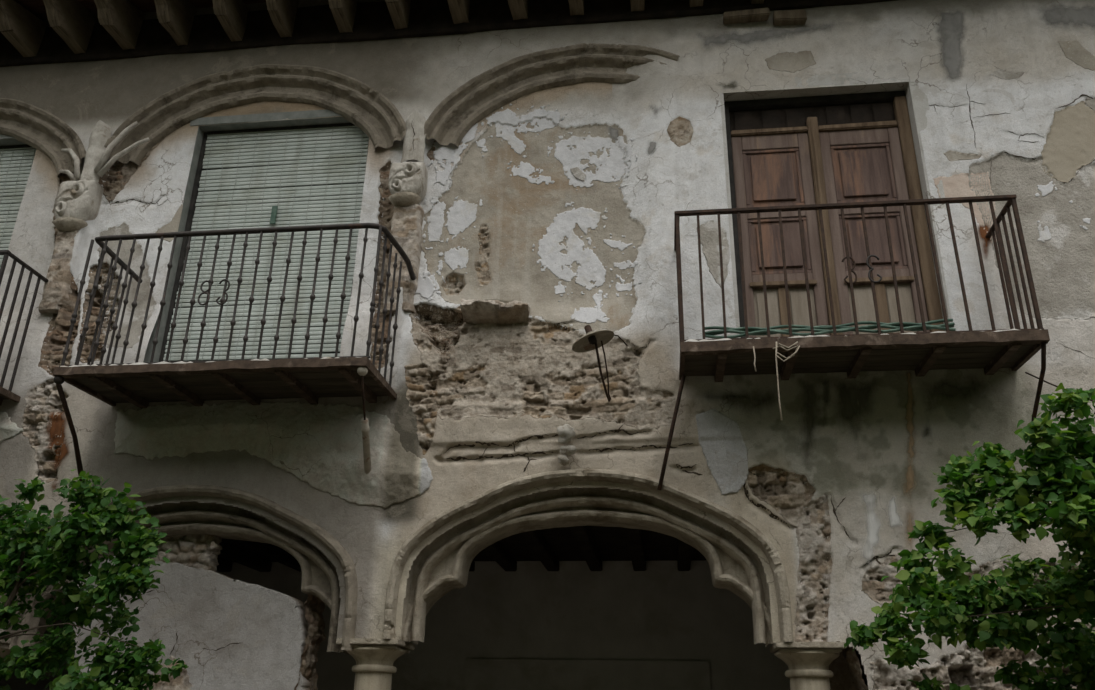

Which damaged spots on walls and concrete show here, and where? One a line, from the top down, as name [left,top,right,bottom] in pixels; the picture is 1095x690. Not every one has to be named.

peeling [765,51,816,73]
peeling [667,116,693,147]
crack [929,84,1095,184]
peeling [933,98,1095,321]
flaking render [370,160,394,369]
peeling [404,104,683,455]
peeling [22,222,157,483]
rust [47,411,68,469]
damp [803,381,874,447]
flaking render [861,552,912,612]
flaking render [964,560,1013,590]
flaking render [870,641,1078,690]